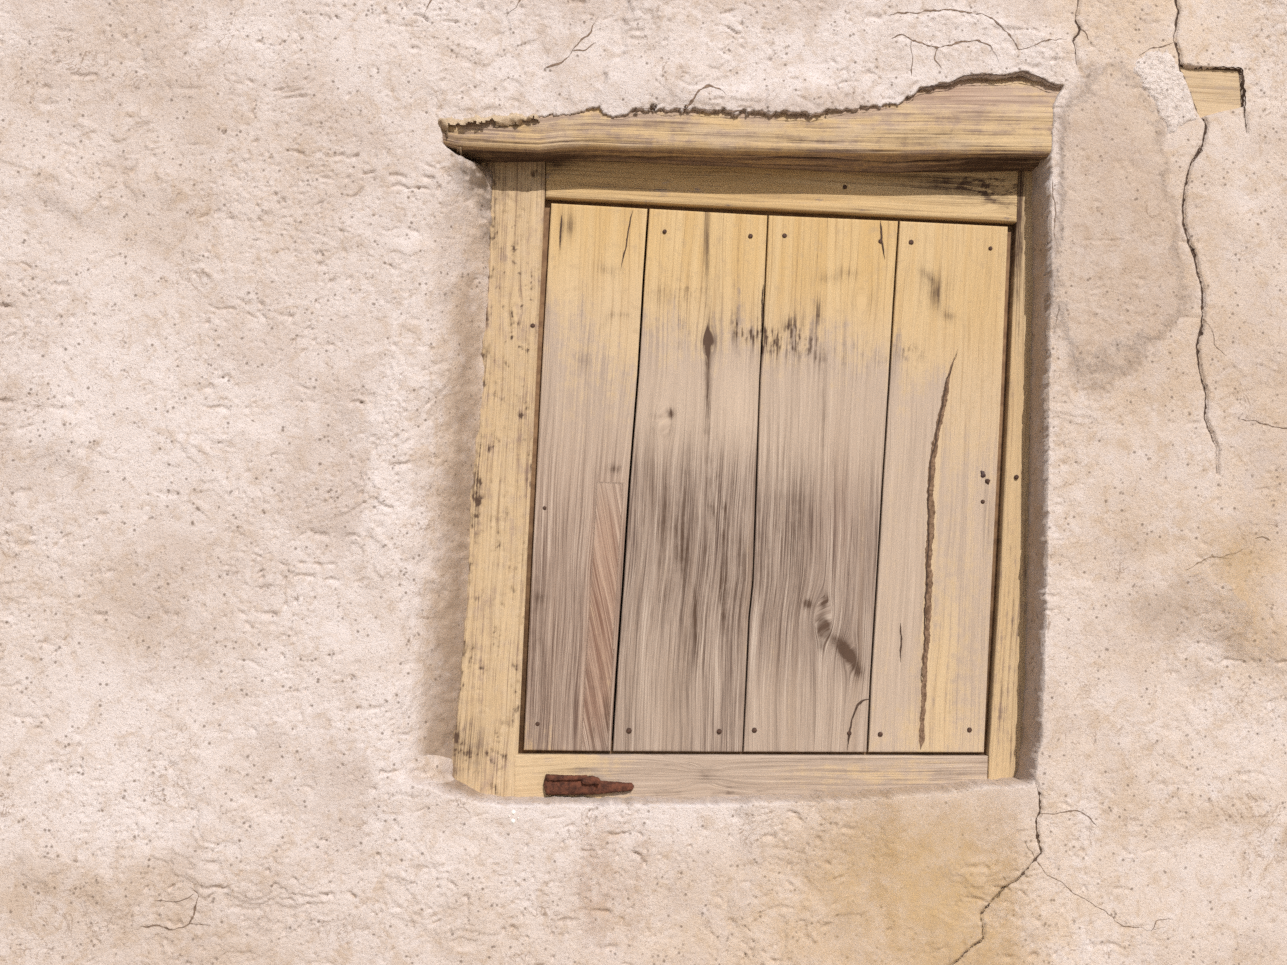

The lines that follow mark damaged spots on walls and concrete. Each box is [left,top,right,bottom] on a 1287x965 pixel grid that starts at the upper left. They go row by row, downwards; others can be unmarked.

flaking render [438,112,540,157]
crack [614,0,1089,116]
crack [1142,0,1247,470]
crack [952,785,1166,965]